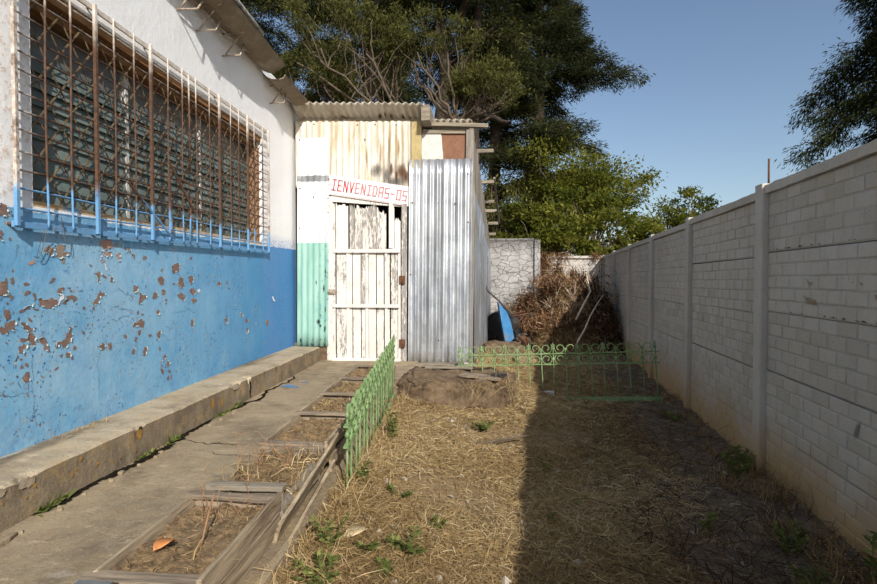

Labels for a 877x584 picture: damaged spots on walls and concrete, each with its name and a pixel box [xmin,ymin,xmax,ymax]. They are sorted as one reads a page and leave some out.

peeling [0,239,147,397]
peeling [124,263,197,380]
crack [32,376,295,515]